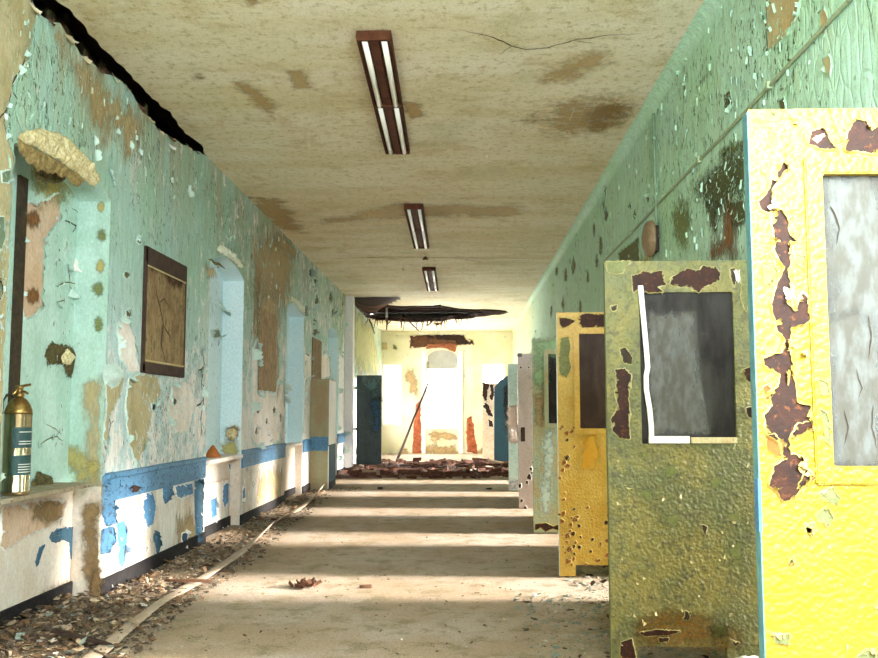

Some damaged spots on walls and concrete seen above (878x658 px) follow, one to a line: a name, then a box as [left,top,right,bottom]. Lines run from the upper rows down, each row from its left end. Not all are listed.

crack [458,29,622,53]
leakage [527,98,632,134]
flaking render [0,0,351,470]
leakage [250,197,303,336]
flaking render [529,0,833,379]
leakage [672,141,746,249]
flaking render [0,498,67,552]
flaking render [31,468,54,486]
flaking render [101,461,163,587]
flaking render [163,462,284,549]
rust [558,425,576,480]
rust [534,492,608,567]